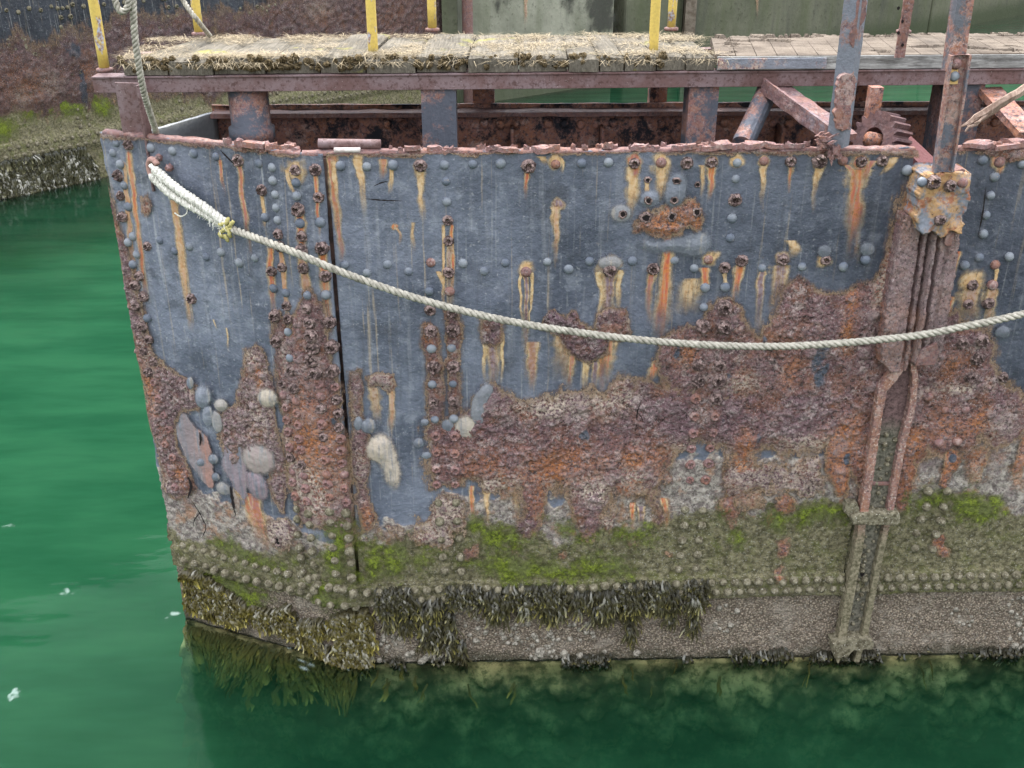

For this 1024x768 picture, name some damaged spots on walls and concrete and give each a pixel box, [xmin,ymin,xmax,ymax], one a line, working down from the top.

corrosion [0,0,442,120]
corrosion [832,71,857,131]
corrosion [538,150,919,314]
peeling [176,413,248,504]
corrosion [100,133,516,500]
corrosion [417,178,910,544]
corrosion [895,251,1024,512]